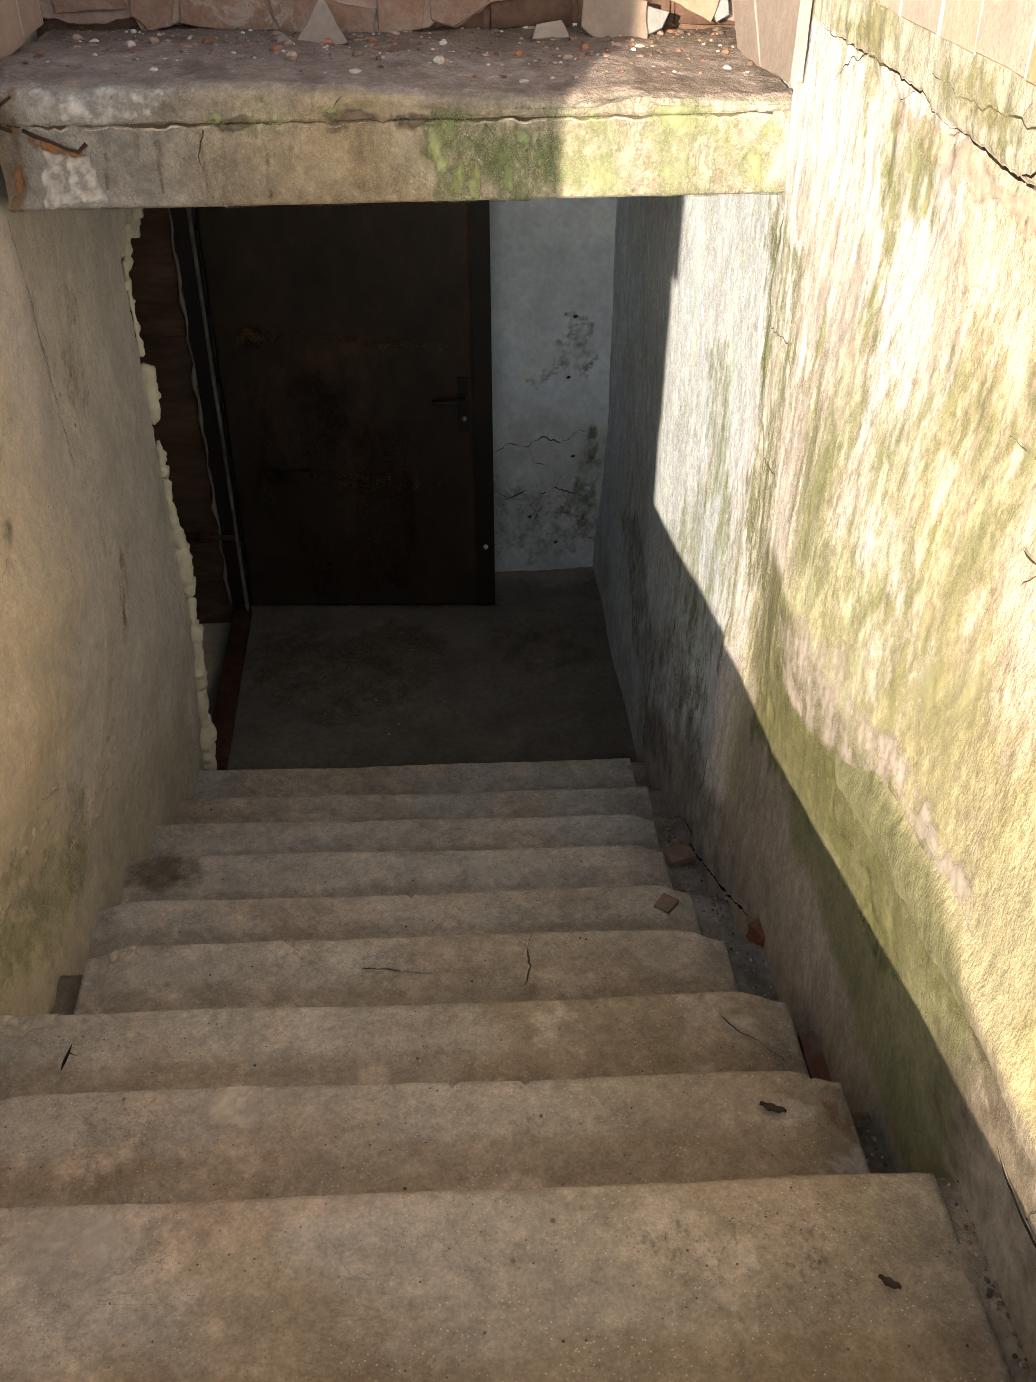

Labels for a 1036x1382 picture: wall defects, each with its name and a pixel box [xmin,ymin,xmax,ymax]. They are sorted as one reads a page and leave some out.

crack [823,23,1036,199]
crack [494,430,589,501]
crack [1012,433,1036,460]
crack [1020,547,1036,586]